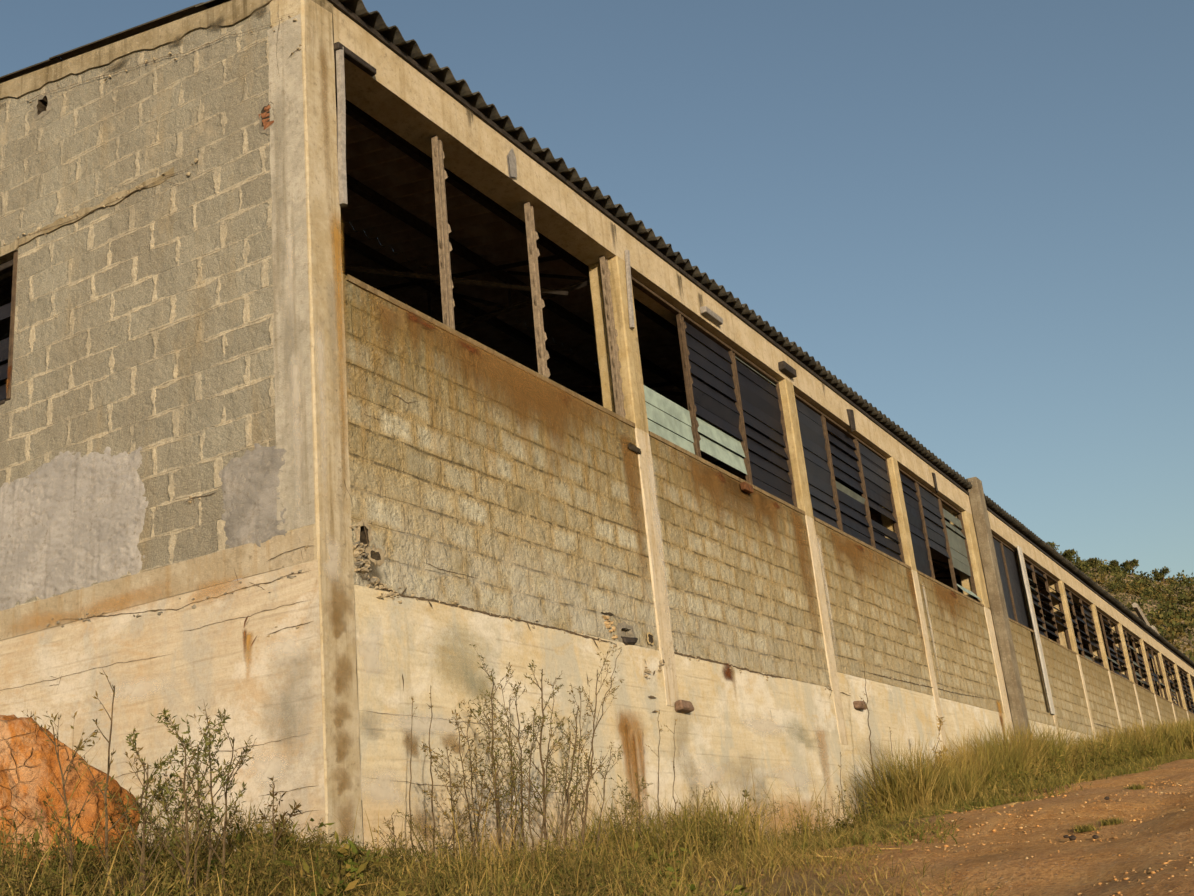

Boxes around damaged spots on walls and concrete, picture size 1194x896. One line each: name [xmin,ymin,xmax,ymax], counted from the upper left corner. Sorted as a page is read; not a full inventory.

crack [10,13,302,109]
crack [0,158,198,247]
spalling [348,519,385,599]
crack [46,545,312,637]
crack [0,654,170,691]
rust [243,630,251,657]
spalling [601,612,654,645]
rust [620,721,643,779]
crack [250,786,316,823]